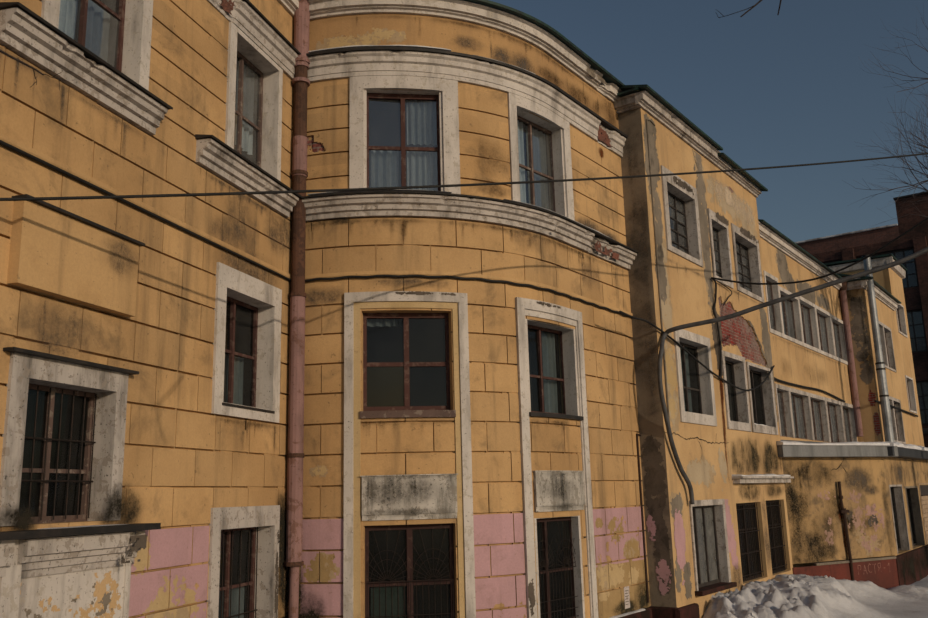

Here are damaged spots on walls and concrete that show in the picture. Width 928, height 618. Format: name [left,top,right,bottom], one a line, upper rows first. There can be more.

flaking render [642,114,680,435]
flaking render [673,150,778,422]
peeling [24,530,208,618]
flaking render [594,435,692,618]
damp [768,465,834,563]
damp [847,470,874,493]